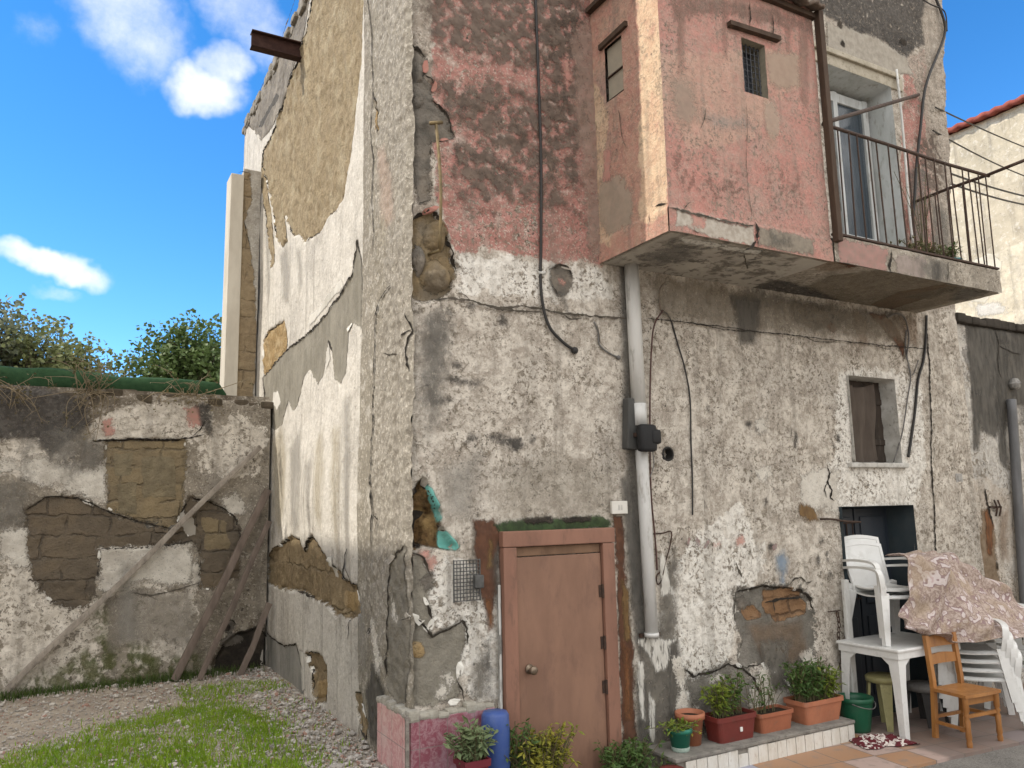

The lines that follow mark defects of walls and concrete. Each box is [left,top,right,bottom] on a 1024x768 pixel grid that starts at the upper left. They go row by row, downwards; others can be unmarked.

spalling [0,419,247,615]
spalling [237,0,364,430]
spalling [267,473,469,707]
crack [367,0,378,244]
spalling [411,45,456,302]
corrosion [473,518,500,631]
mould [421,0,590,214]
corrosion [612,516,637,740]
crack [433,293,937,551]
spalling [670,581,818,733]
leakage [621,235,900,398]
leakage [820,0,925,57]